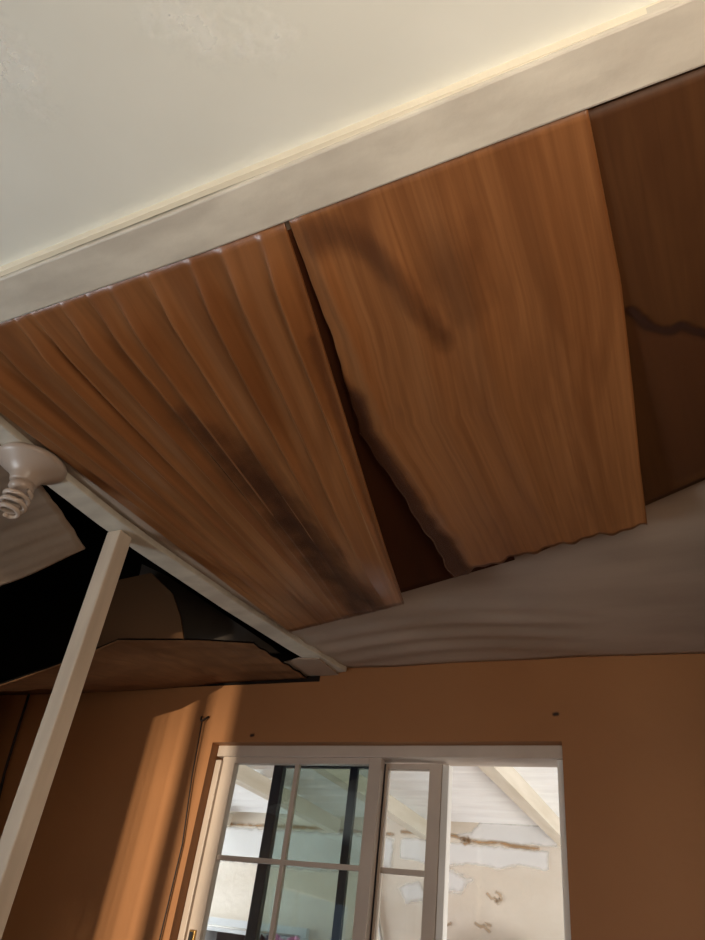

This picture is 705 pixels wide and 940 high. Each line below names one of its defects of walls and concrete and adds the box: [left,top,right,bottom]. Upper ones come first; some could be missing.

water stain [221,454,379,613]
water stain [347,389,469,577]